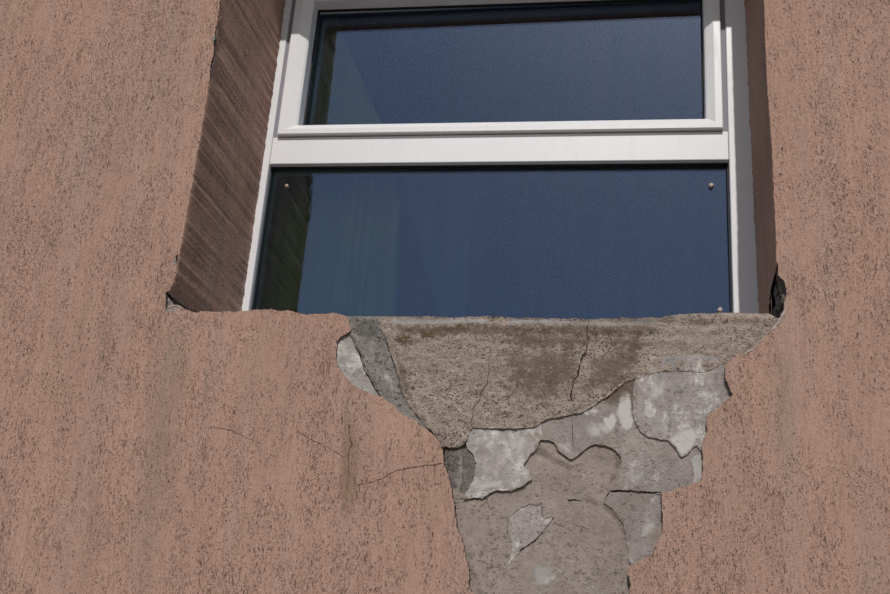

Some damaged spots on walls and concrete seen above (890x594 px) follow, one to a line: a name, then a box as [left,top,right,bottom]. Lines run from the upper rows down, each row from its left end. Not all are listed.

crack [209,1,221,83]
crack [352,463,442,486]
spalling [337,278,786,594]
crack [570,322,589,439]